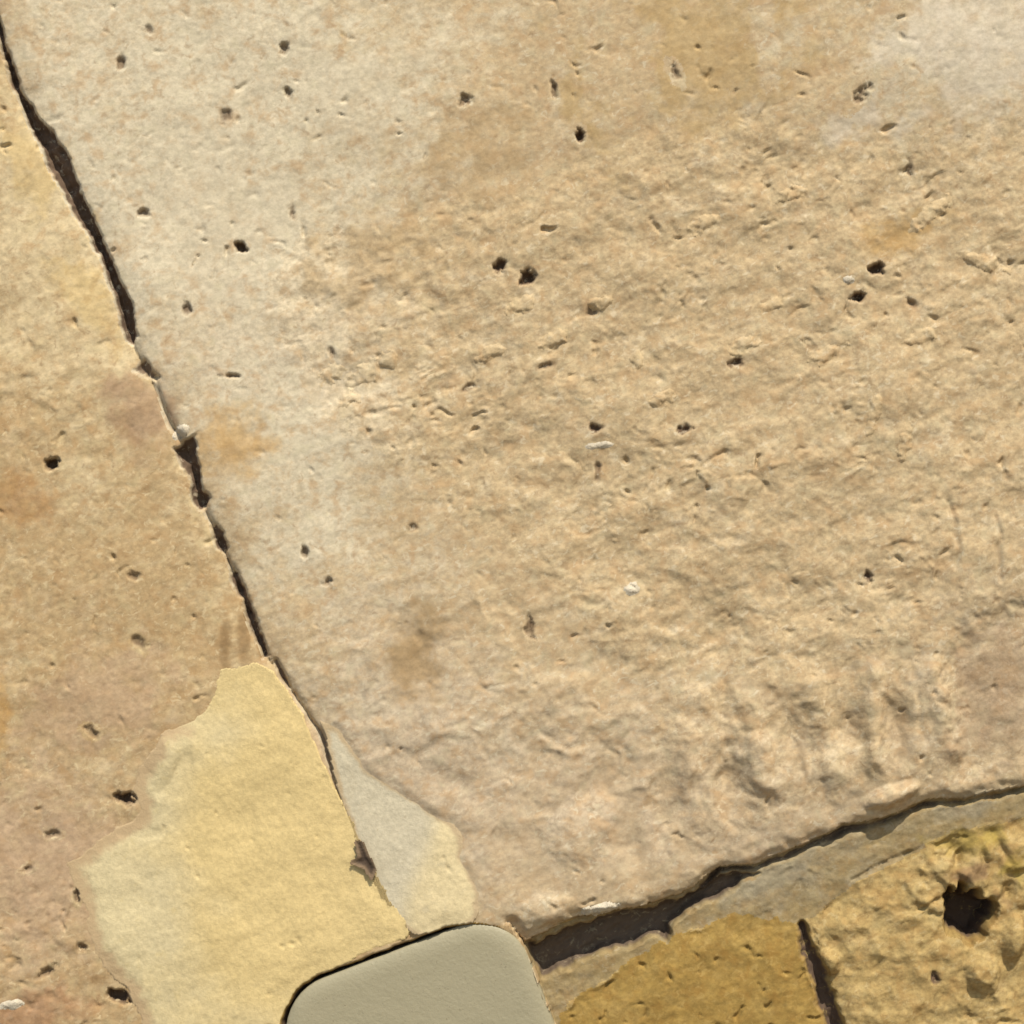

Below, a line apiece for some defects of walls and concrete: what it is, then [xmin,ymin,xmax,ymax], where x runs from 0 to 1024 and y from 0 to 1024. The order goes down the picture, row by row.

crack [0,18,339,793]
crack [523,786,1024,980]